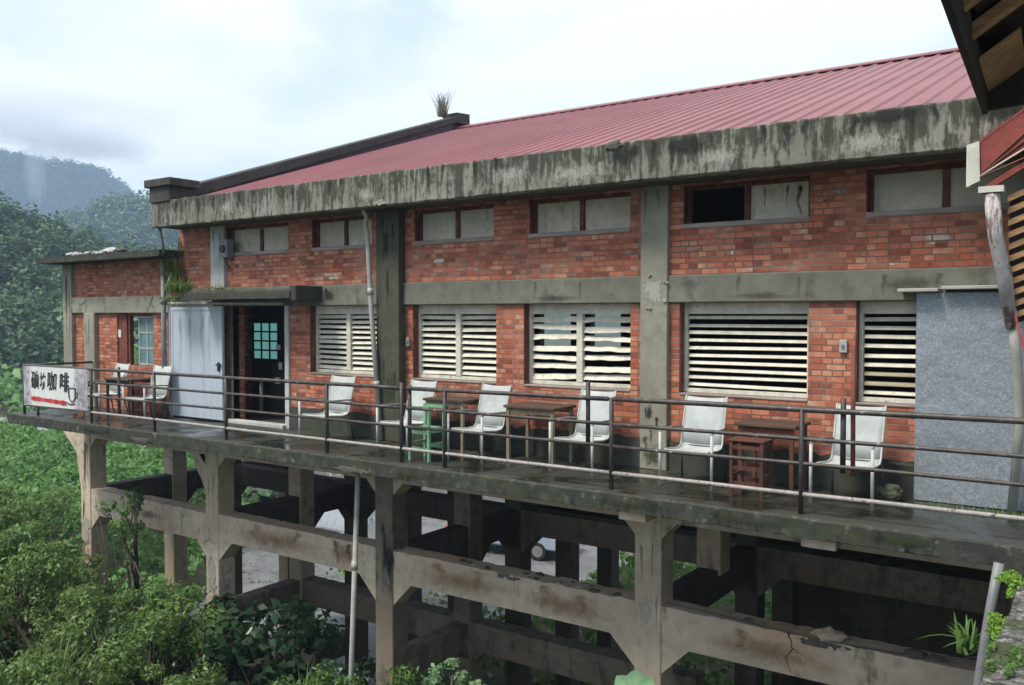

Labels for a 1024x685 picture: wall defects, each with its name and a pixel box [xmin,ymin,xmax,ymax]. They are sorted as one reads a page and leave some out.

water stain [783,119,809,143]
water stain [842,108,914,150]
water stain [612,143,637,167]
water stain [669,133,734,163]
water stain [555,164,602,180]
peeling [642,274,669,310]
crack [785,633,806,673]
spalling [796,637,851,652]